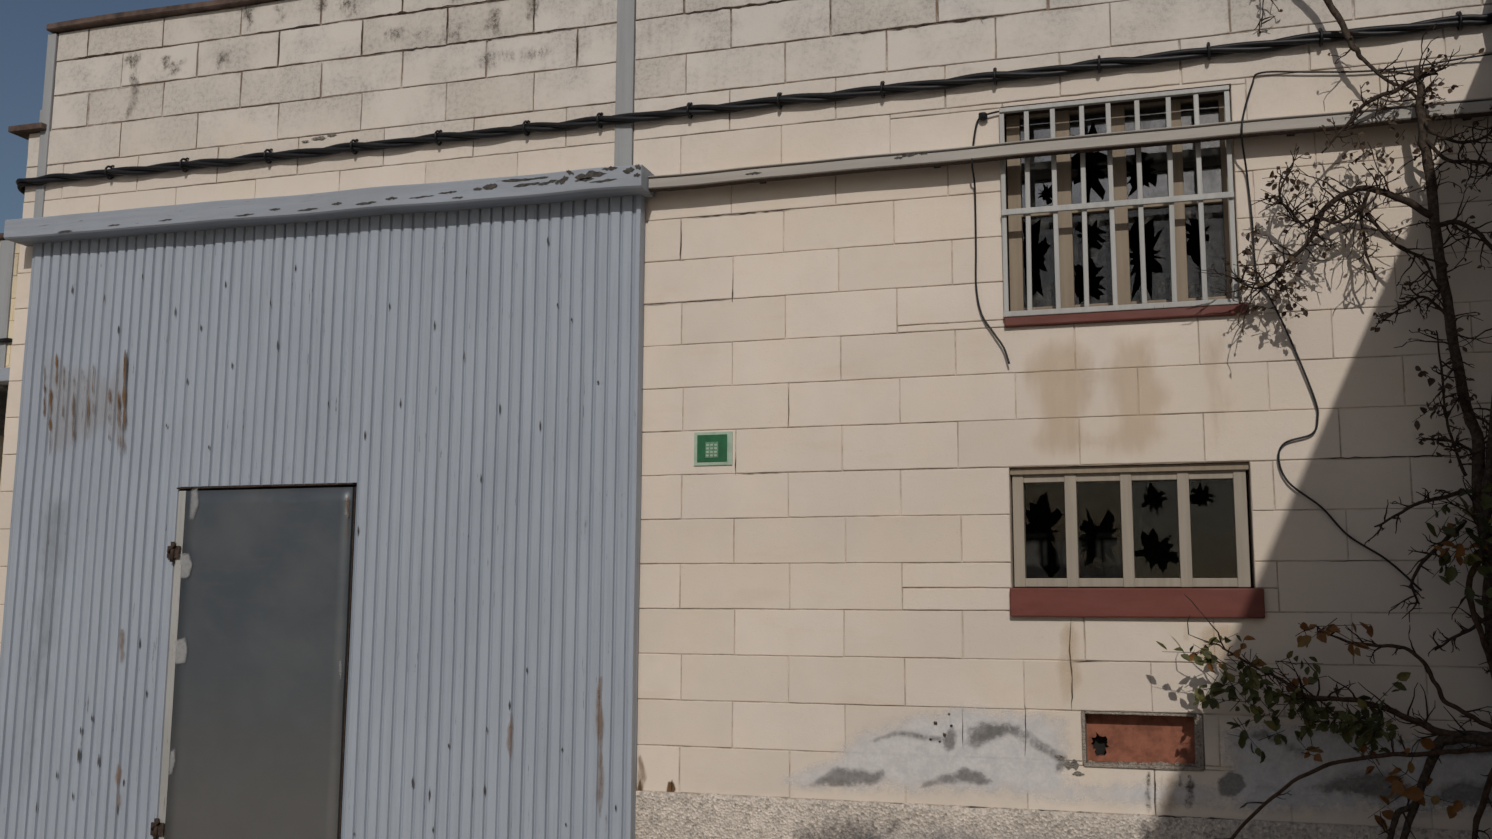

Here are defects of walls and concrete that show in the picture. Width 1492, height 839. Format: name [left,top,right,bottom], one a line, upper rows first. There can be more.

rust [43,349,127,449]
spalling [1092,734,1108,755]
spalling [1055,755,1085,776]